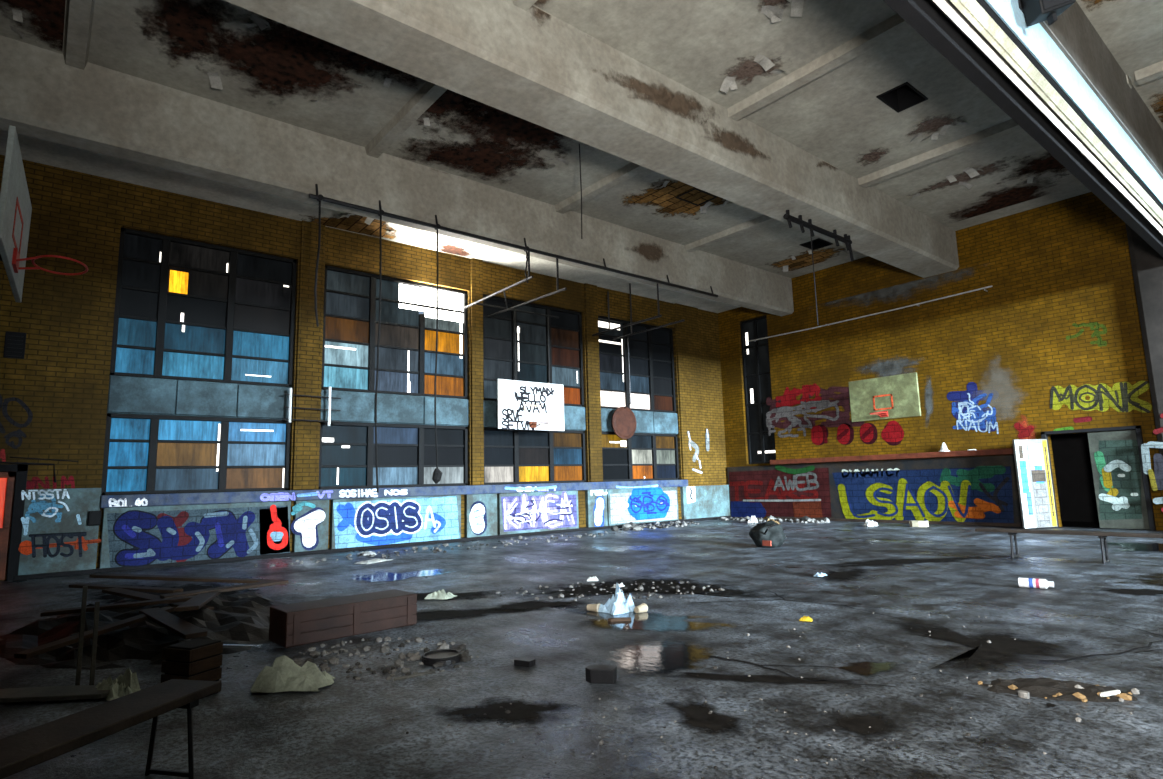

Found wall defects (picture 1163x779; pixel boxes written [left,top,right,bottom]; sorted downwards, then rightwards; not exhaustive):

peeling [1151,94,1163,122]
peeling [623,179,731,220]